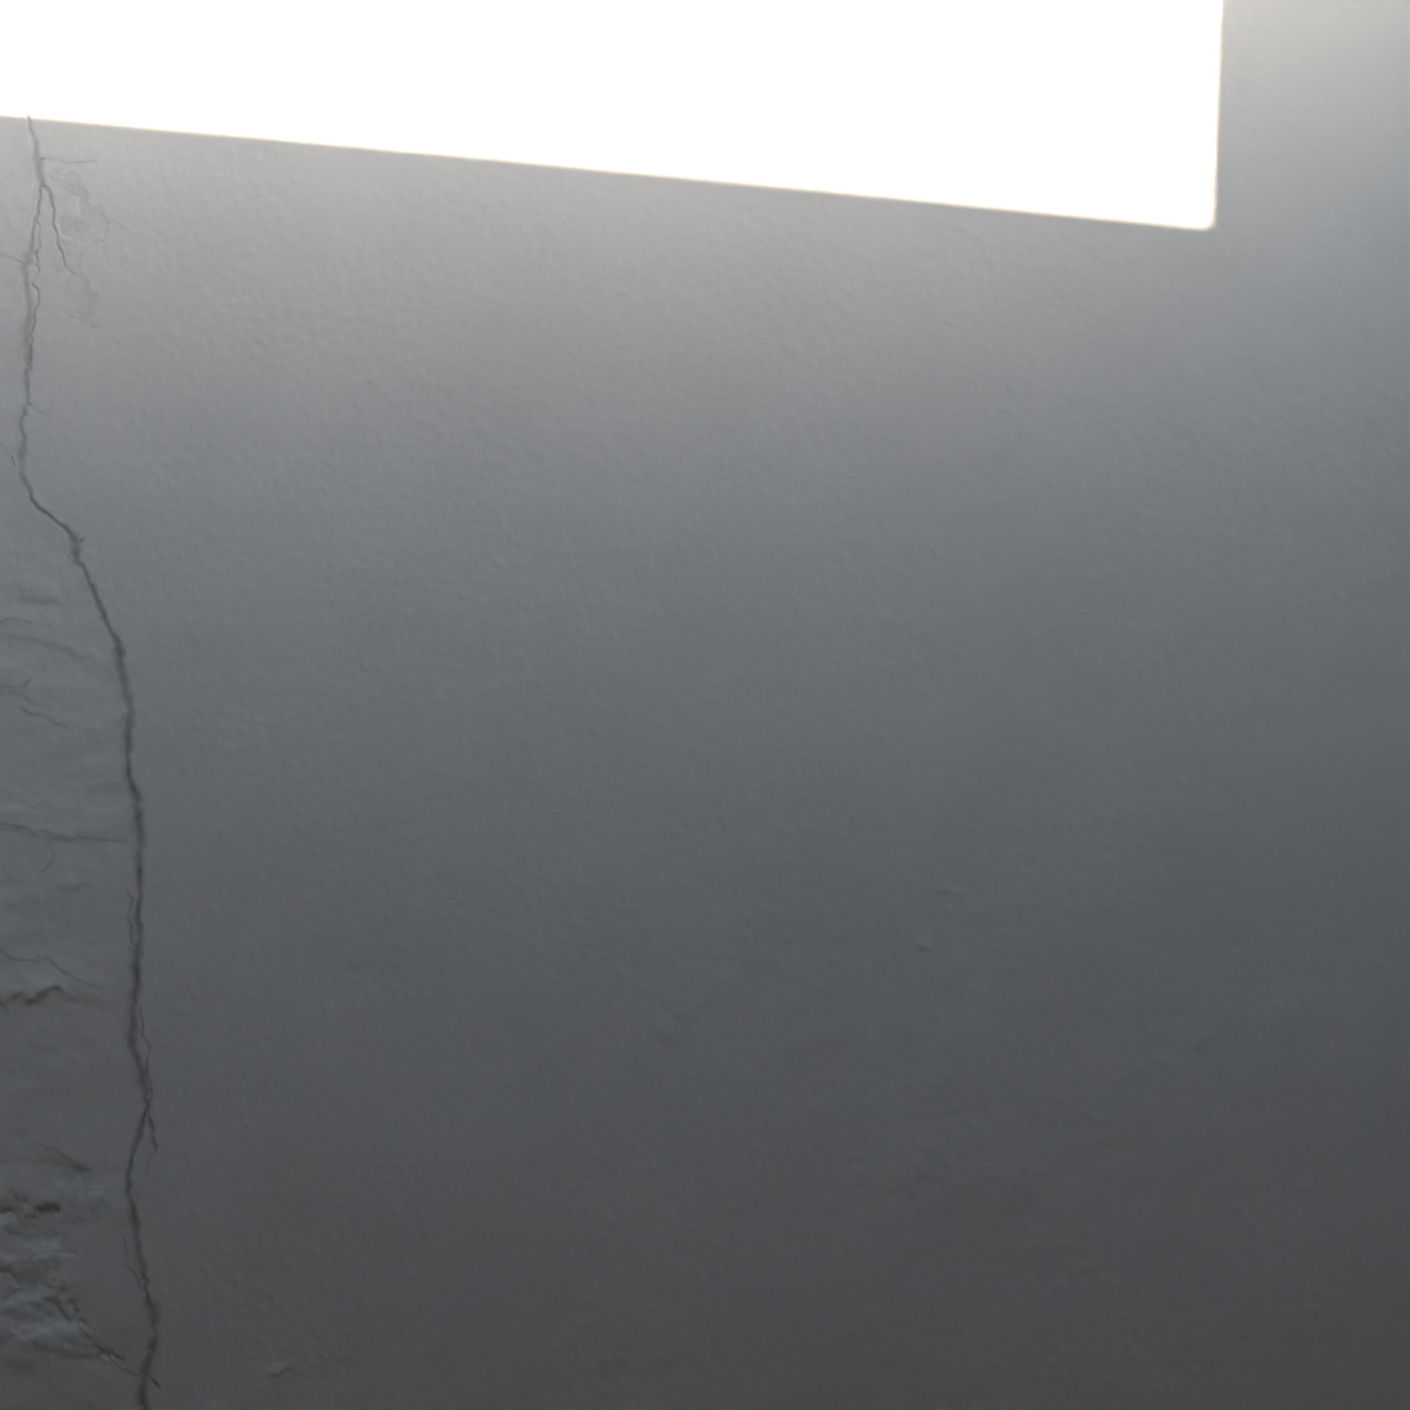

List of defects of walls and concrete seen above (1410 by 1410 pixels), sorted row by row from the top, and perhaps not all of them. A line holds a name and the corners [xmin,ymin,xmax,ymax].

crack [0,0,164,1410]